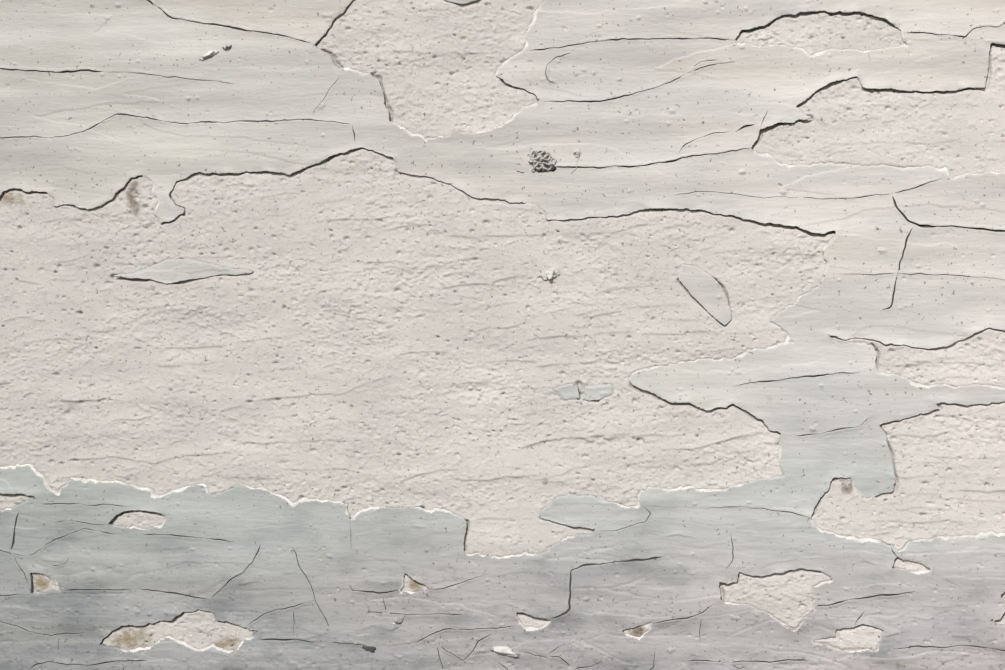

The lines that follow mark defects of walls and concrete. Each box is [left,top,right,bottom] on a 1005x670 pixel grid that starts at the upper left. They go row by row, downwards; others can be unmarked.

crack [0,69,358,144]
crack [141,0,314,46]
peeling [312,0,544,142]
crack [527,34,738,106]
crack [554,107,771,172]
peeling [731,7,908,58]
peeling [749,39,1005,179]
crack [670,174,1005,315]
peeling [0,143,839,559]
peeling [808,324,1005,575]
peeling [95,605,262,654]
crack [344,504,666,670]